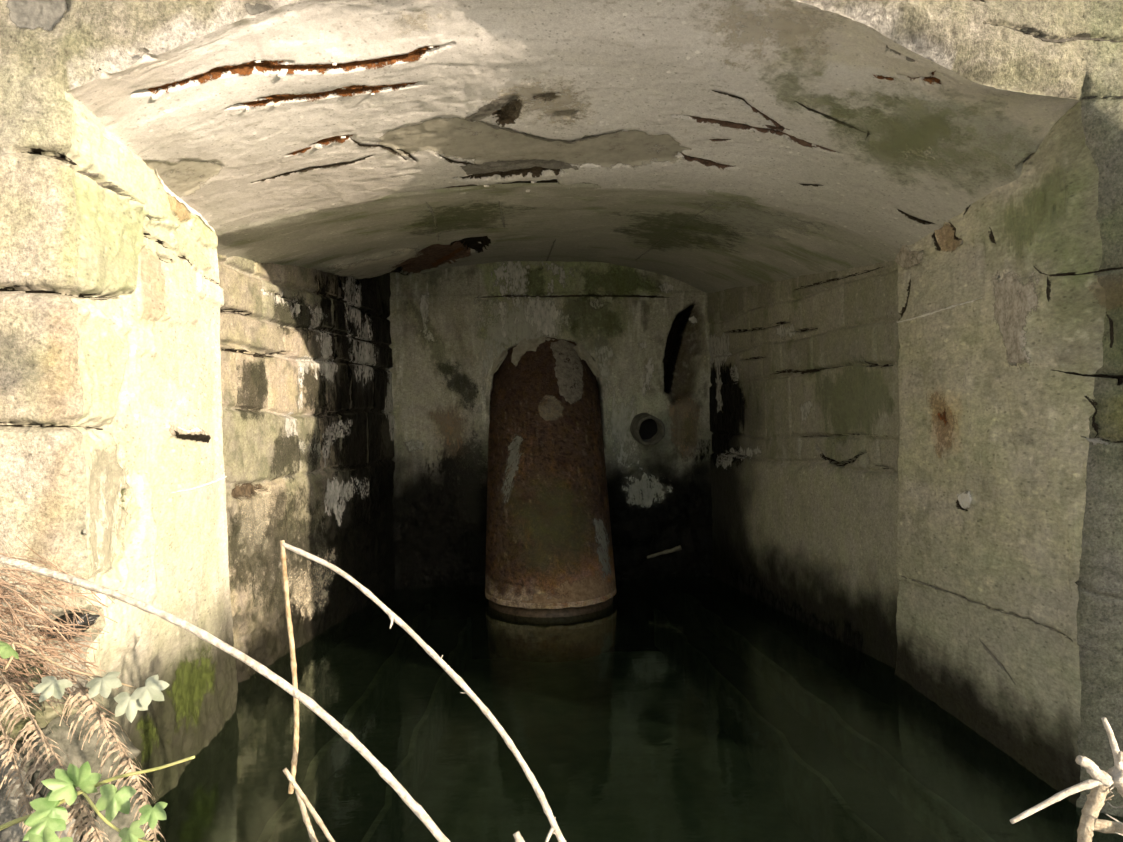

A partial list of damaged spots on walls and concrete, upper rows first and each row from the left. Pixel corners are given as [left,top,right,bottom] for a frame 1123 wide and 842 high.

crack [973,0,1120,43]
crack [251,135,476,183]
flaking render [378,93,691,194]
crack [678,90,870,170]
flaking render [391,236,491,274]
water stain [228,274,488,611]
water stain [501,436,523,503]
crack [902,576,1098,654]
crack [980,640,1015,684]